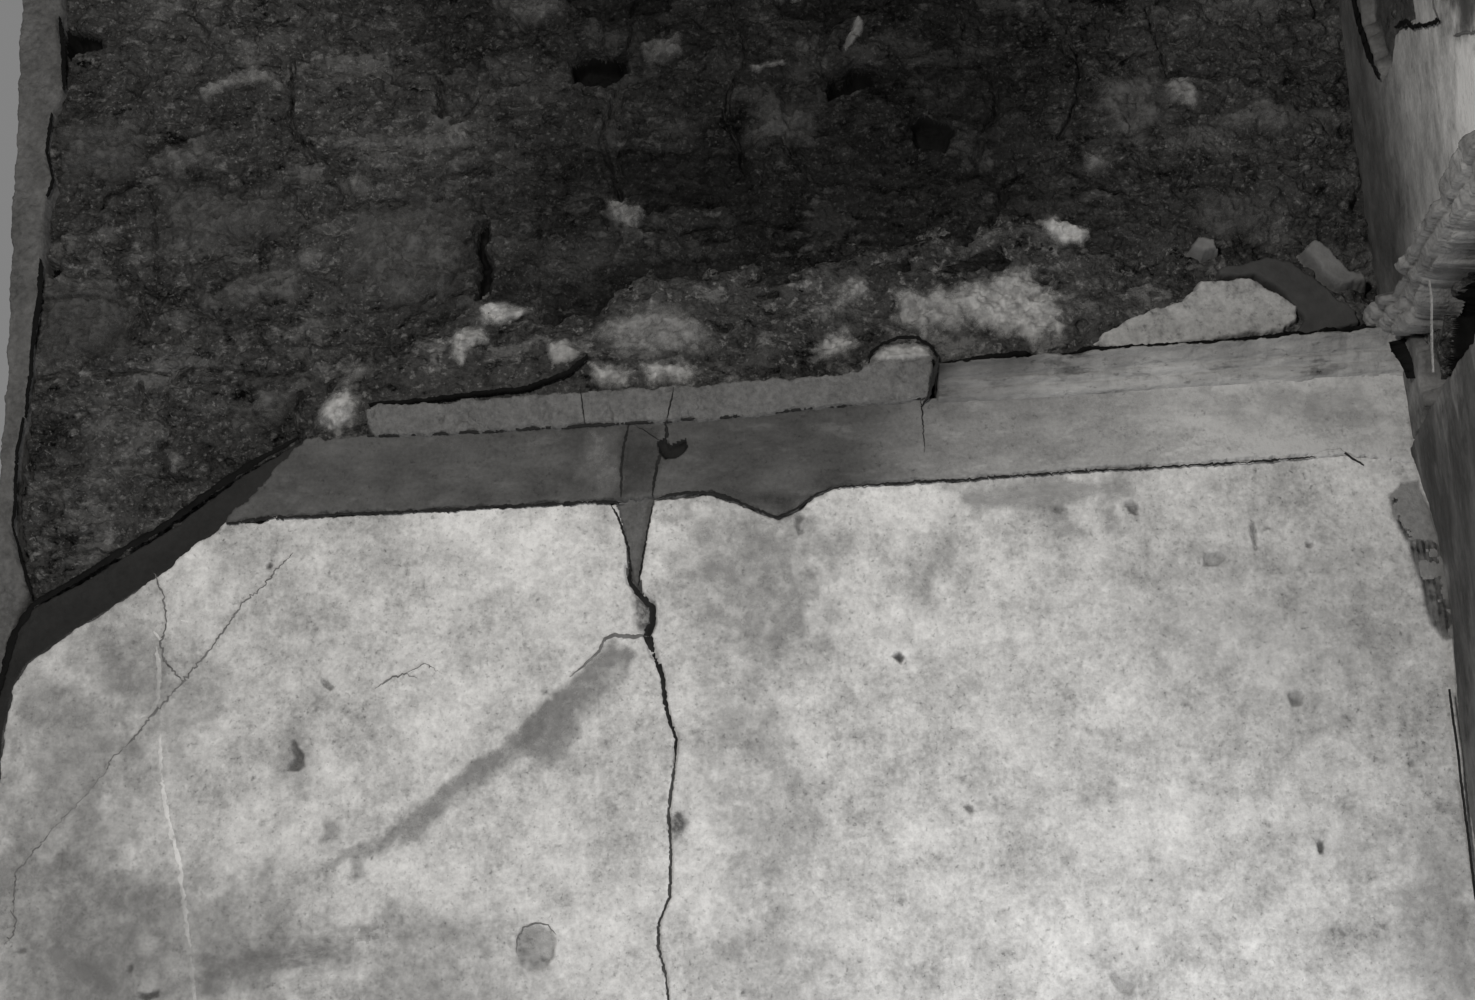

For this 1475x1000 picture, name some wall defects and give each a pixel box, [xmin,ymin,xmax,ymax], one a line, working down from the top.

crack [45,16,66,197]
flaking render [1376,0,1416,61]
flaking render [21,0,1377,608]
crack [0,258,1415,1000]
water stain [402,645,634,838]